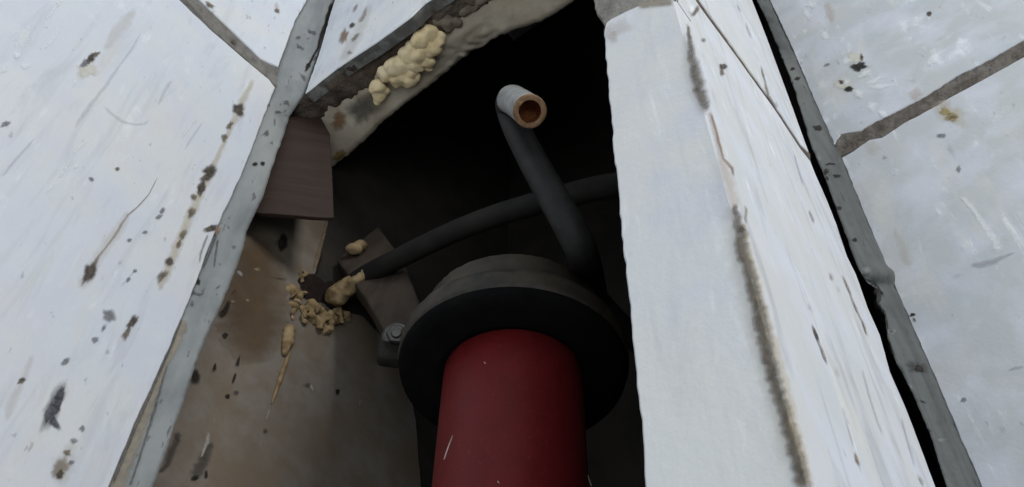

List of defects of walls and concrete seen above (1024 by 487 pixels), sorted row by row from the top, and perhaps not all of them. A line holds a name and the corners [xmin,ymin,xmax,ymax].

damp [687,26,709,109]
rust [222,104,243,141]
rust [189,166,216,217]
damp [732,205,807,486]